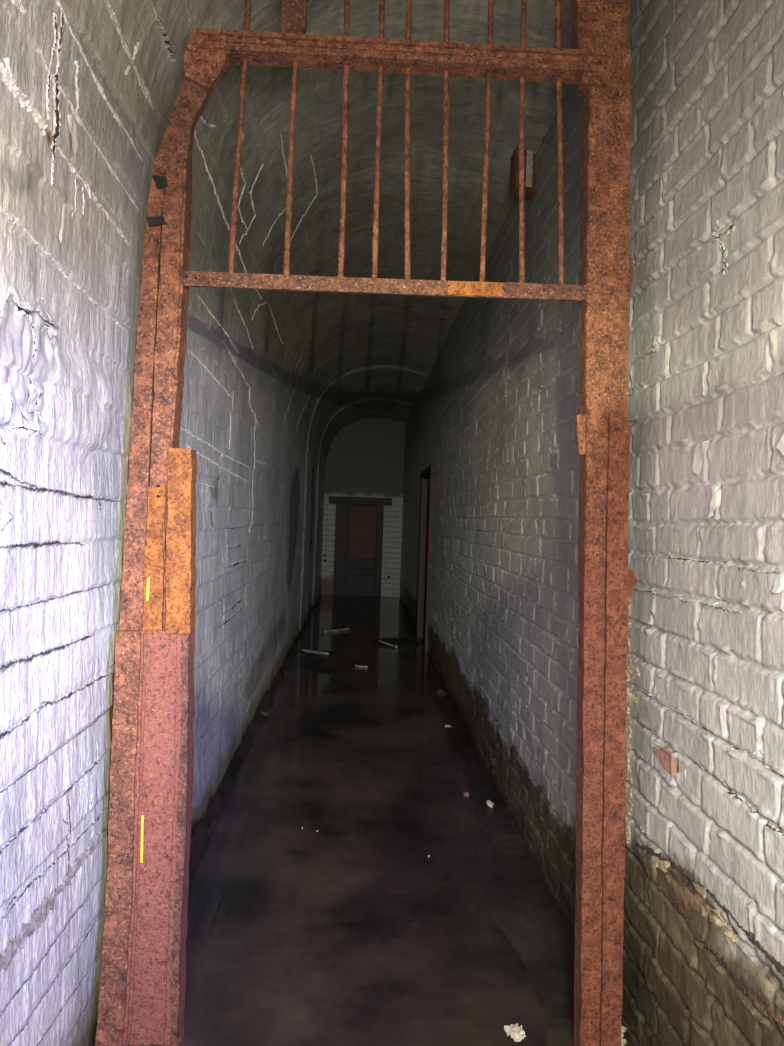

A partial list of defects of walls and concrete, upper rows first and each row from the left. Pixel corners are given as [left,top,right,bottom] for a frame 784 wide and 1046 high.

crack [46,10,85,217]
rust [448,281,503,297]
crack [0,468,122,550]
crack [0,633,95,673]
crack [0,673,109,740]
rust [170,634,190,1045]